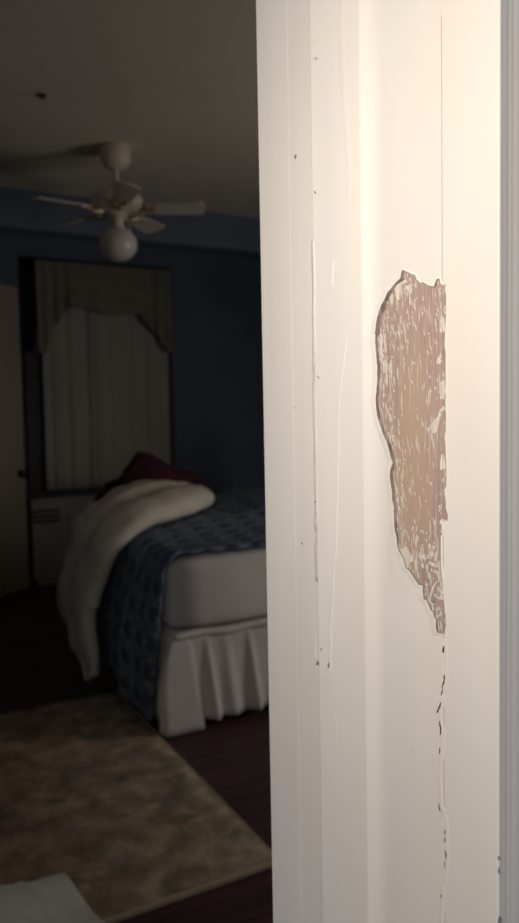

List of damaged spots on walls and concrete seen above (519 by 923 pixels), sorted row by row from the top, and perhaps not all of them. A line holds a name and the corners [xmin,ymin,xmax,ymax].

peeling [369,267,450,637]
crack [436,637,450,923]